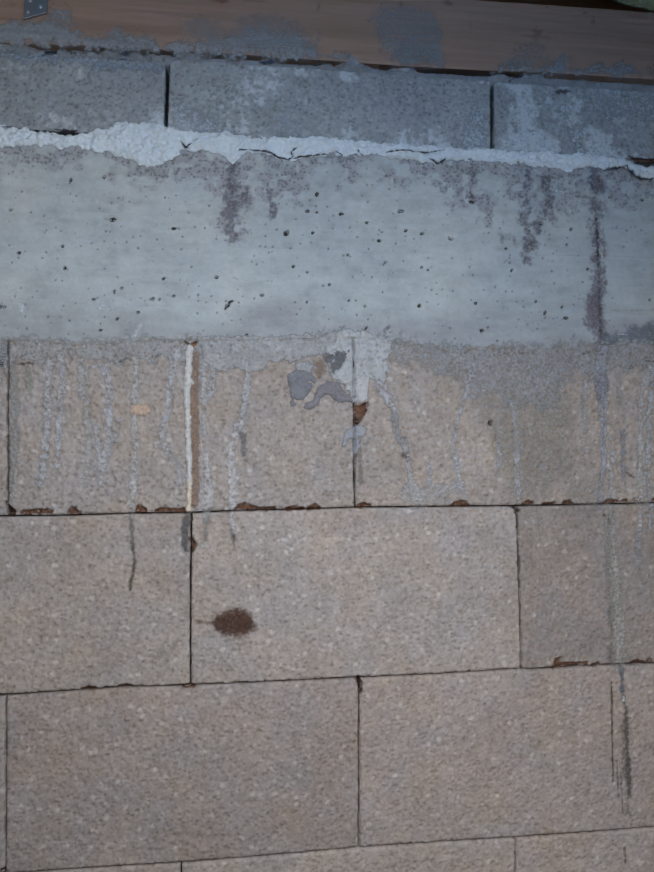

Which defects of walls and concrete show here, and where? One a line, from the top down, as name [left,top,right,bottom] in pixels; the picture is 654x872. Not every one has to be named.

crack [239,148,363,160]
crack [386,150,446,164]
peeling [304,360,369,424]
leakage [0,324,339,591]
leakage [374,167,654,793]